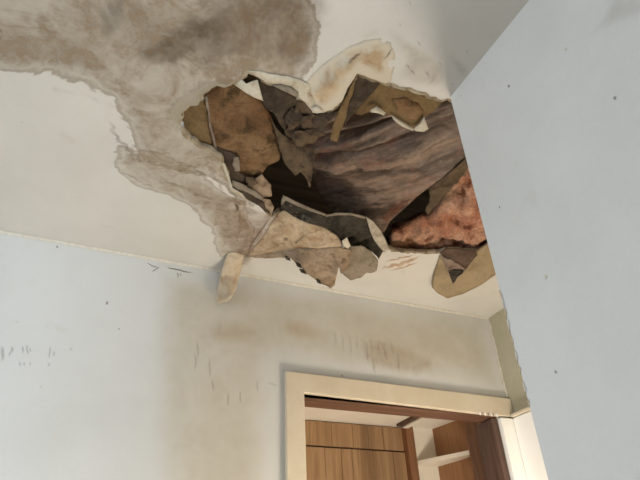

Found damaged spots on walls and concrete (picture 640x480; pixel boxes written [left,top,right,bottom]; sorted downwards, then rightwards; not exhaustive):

leakage [0,0,310,154]
flaking render [170,84,226,127]
peeling [247,70,324,113]
peeling [217,252,244,304]